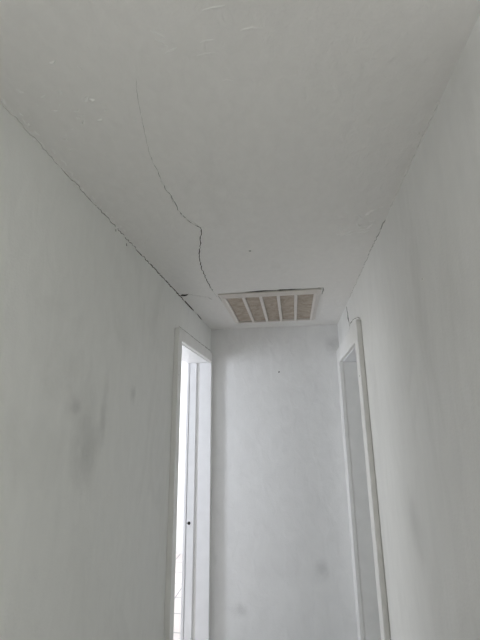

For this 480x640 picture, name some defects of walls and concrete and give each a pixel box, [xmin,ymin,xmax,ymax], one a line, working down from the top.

crack [0,78,233,351]